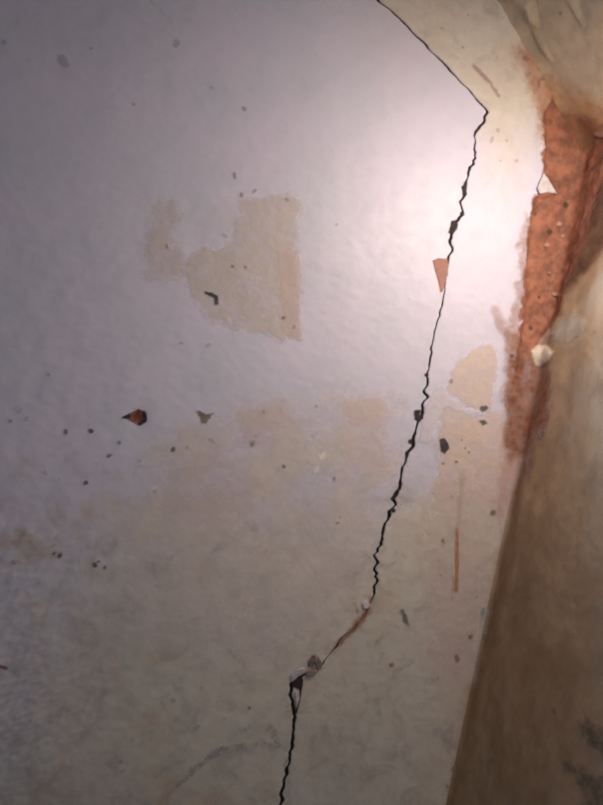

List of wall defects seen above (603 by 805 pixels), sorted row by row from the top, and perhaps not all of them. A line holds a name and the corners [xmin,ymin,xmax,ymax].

peeling [146,193,303,341]
crack [377,0,488,263]
spalling [514,98,603,377]
crack [361,282,446,617]
crack [279,632,348,805]